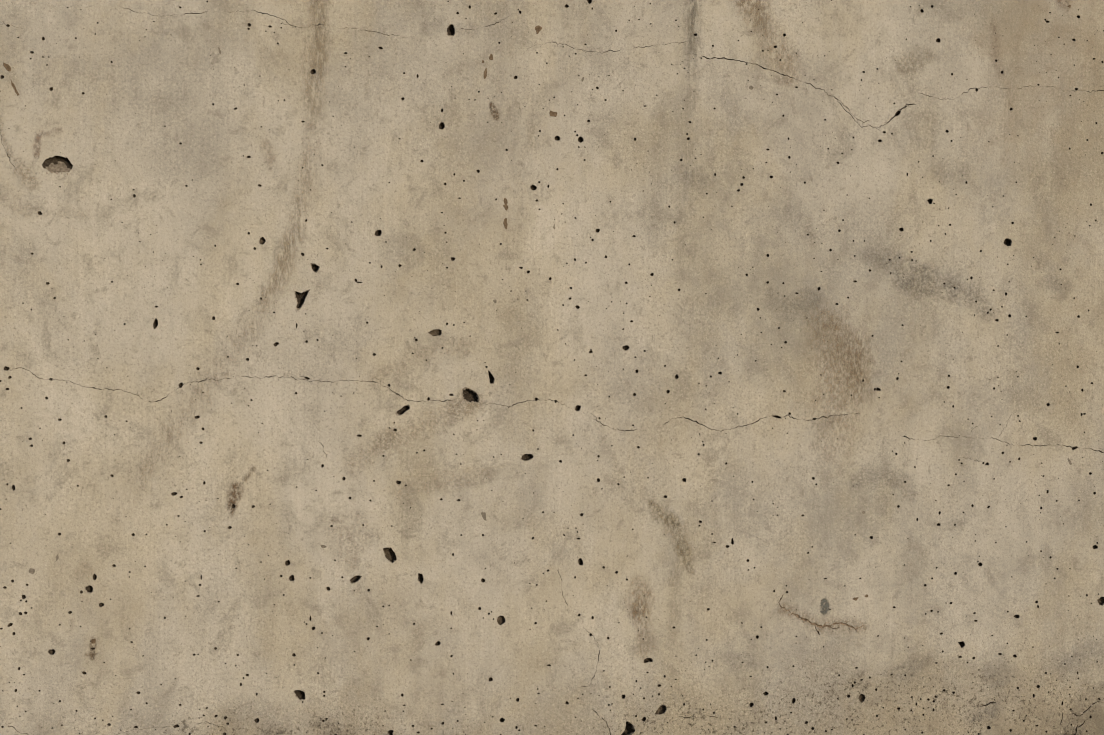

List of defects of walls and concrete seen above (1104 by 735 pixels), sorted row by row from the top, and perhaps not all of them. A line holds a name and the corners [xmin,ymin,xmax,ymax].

crack [528,41,1104,129]
crack [10,367,451,402]
crack [664,413,858,431]
crack [903,415,1104,462]
crack [778,594,865,635]